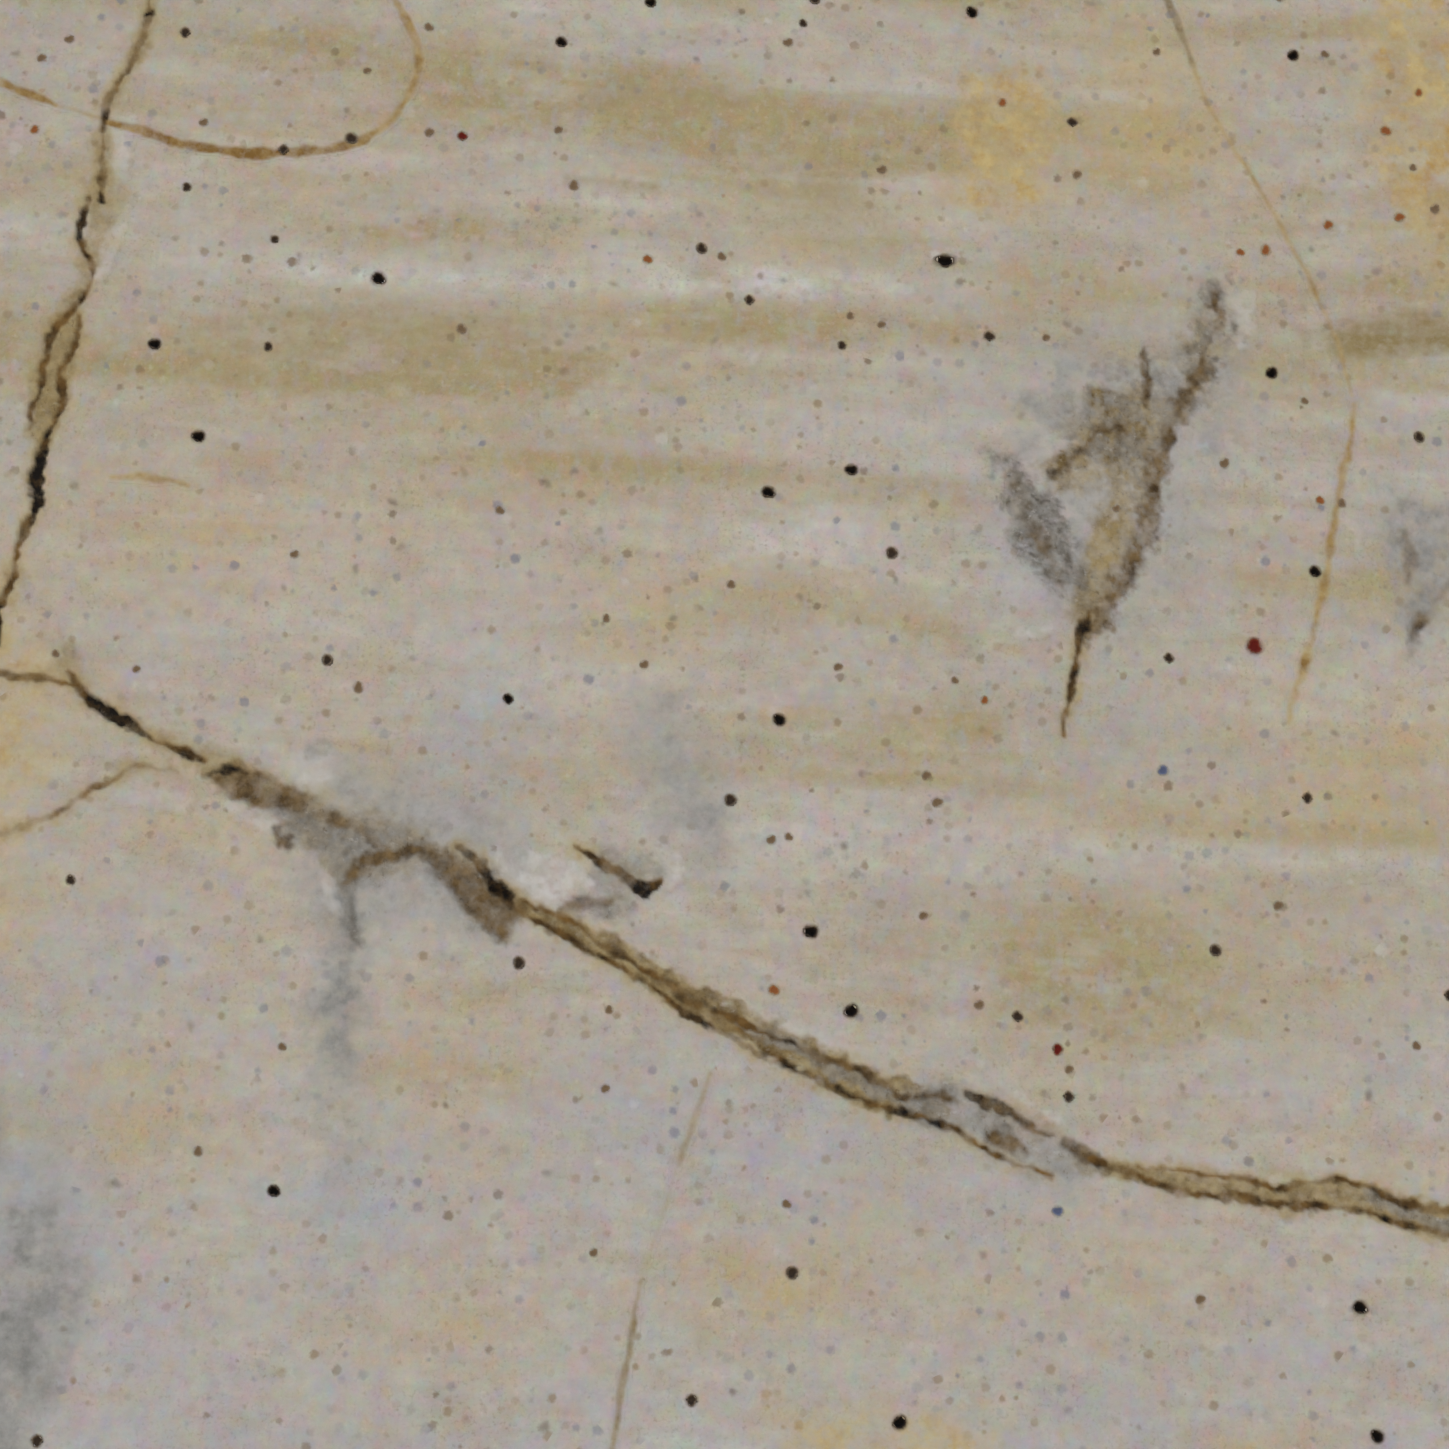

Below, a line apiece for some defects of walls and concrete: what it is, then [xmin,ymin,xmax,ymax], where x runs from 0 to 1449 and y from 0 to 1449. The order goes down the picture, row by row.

crack [0,0,427,850]
crack [1161,0,1359,729]
crack [486,892,1449,1449]